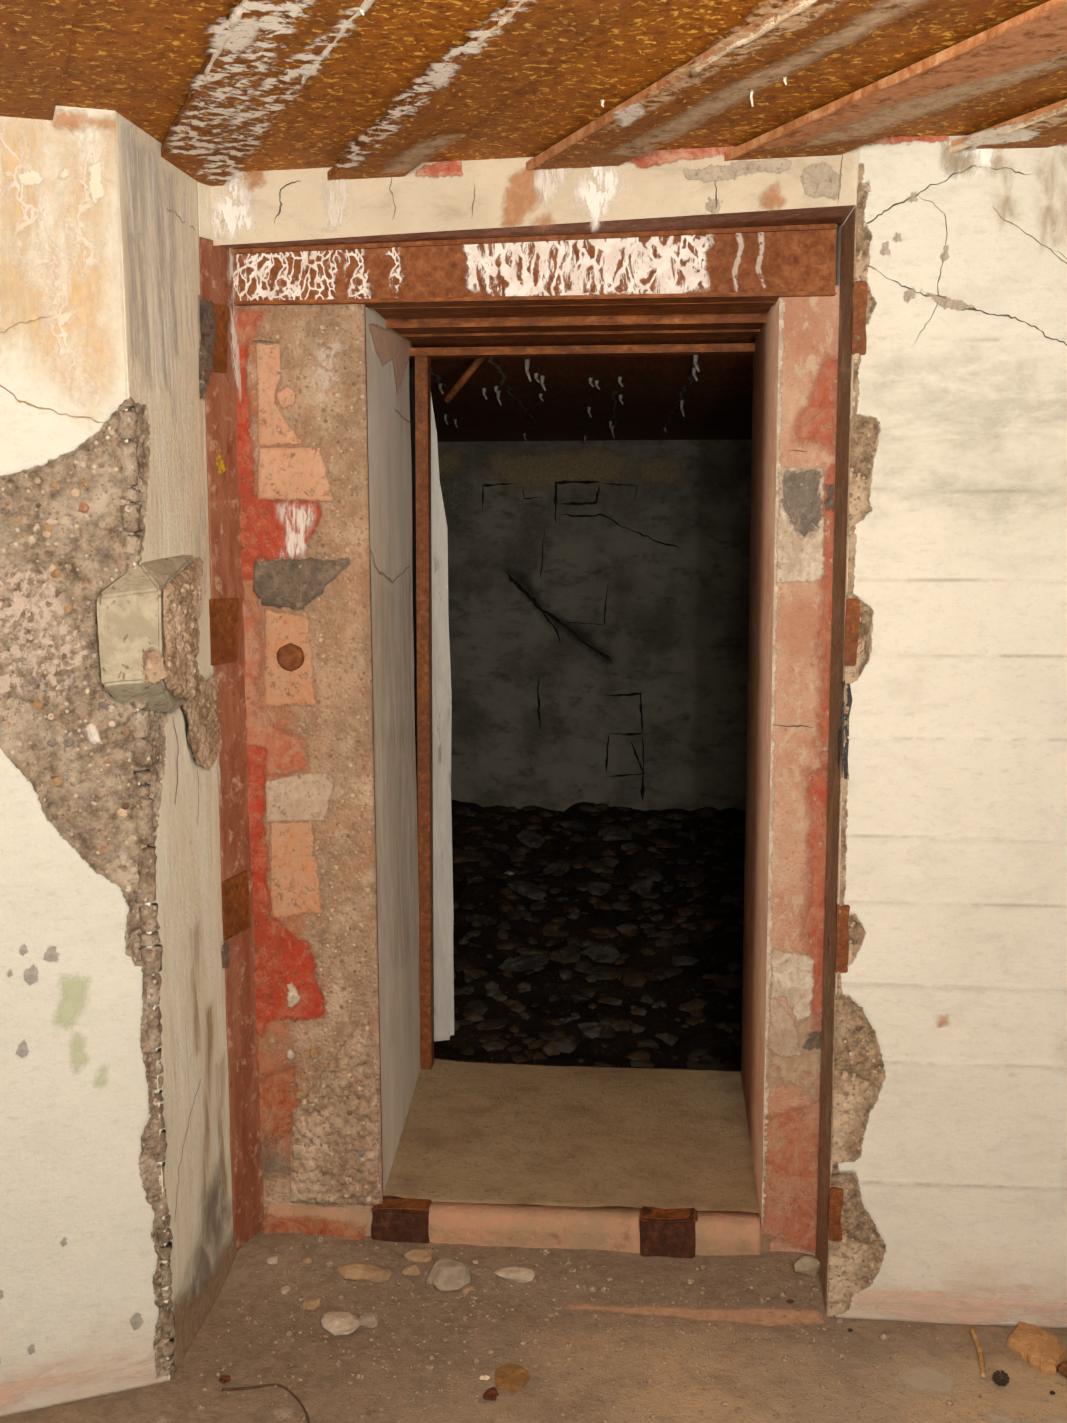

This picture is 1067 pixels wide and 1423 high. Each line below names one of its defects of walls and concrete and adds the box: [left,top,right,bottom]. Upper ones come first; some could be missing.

corrosion [55,113,116,129]
damp [167,0,374,399]
damp [386,247,402,291]
damp [325,0,531,227]
peeling [416,160,463,177]
corrosion [502,169,542,226]
peeling [628,2,1067,214]
crack [838,155,1067,345]
crack [482,480,681,801]
peeling [761,164,1067,1332]
spalling [0,396,223,1378]
corrosion [195,992,212,1062]